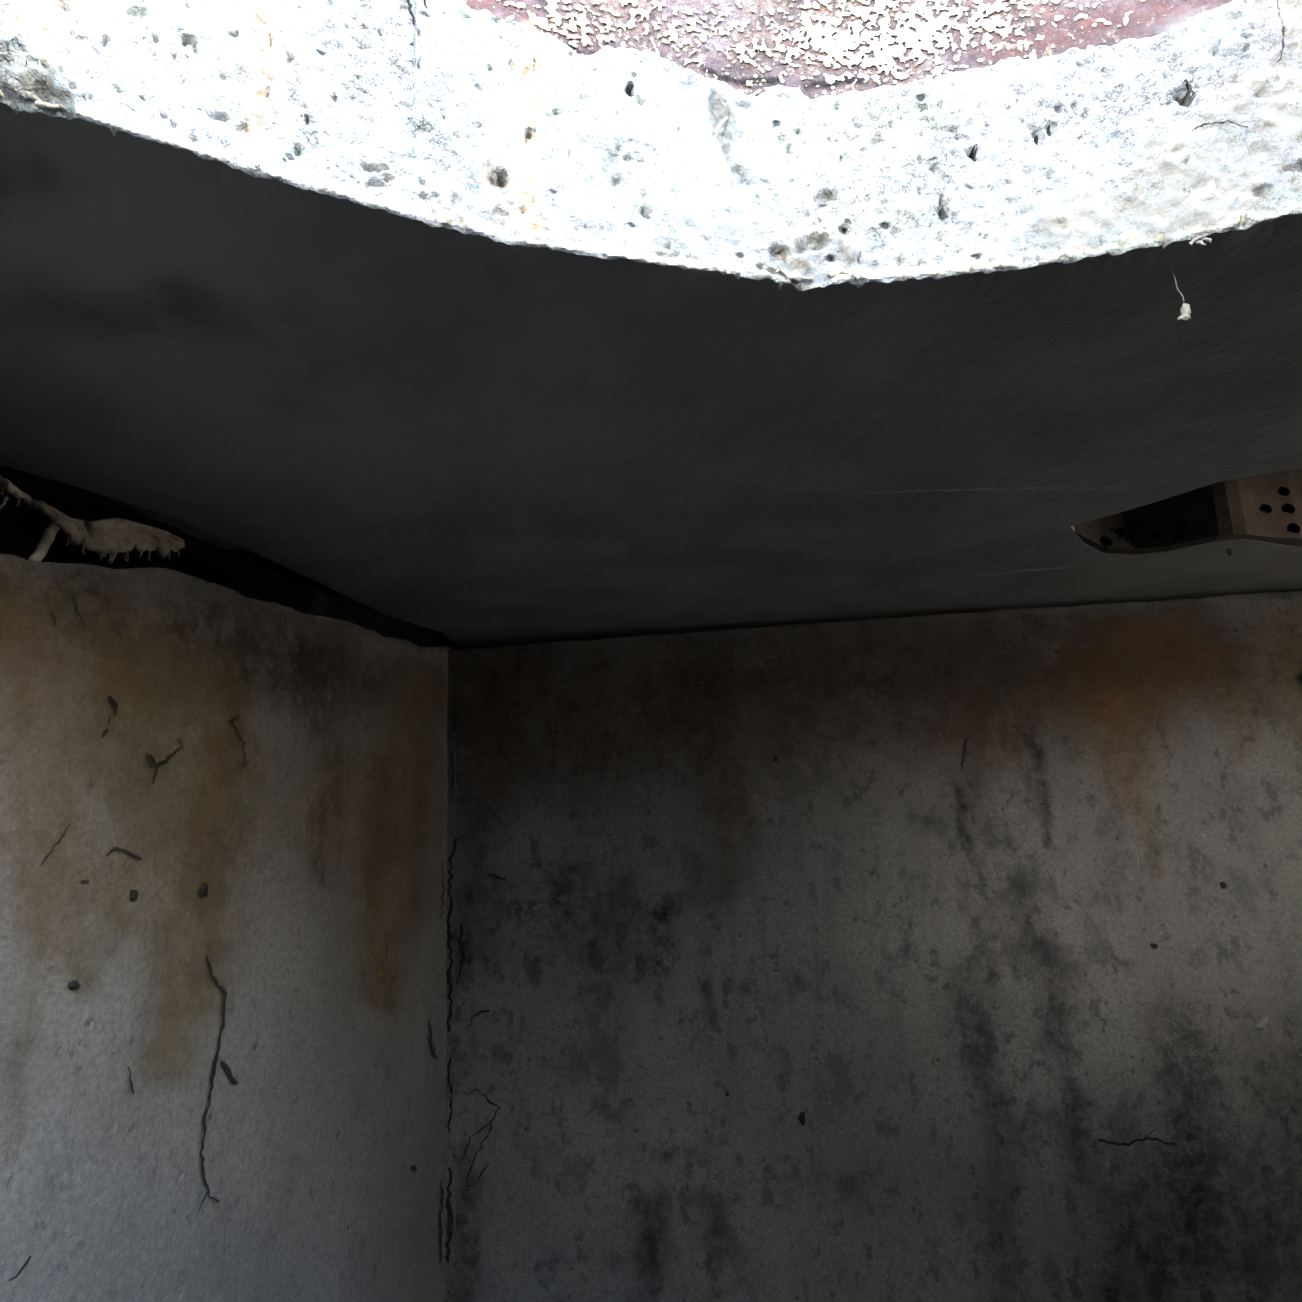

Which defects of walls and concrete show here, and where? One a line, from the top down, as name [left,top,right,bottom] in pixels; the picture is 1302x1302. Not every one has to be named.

spalling [0,36,76,112]
rust [472,0,594,130]
rust [702,67,780,85]
peeling [465,0,1166,97]
rust [805,77,863,87]
rust [981,0,1215,61]
spalling [1175,79,1198,108]
crack [1191,120,1248,132]
crack [1277,0,1285,63]
spalling [770,218,857,283]
crack [427,717,500,1302]
crack [198,955,239,1212]